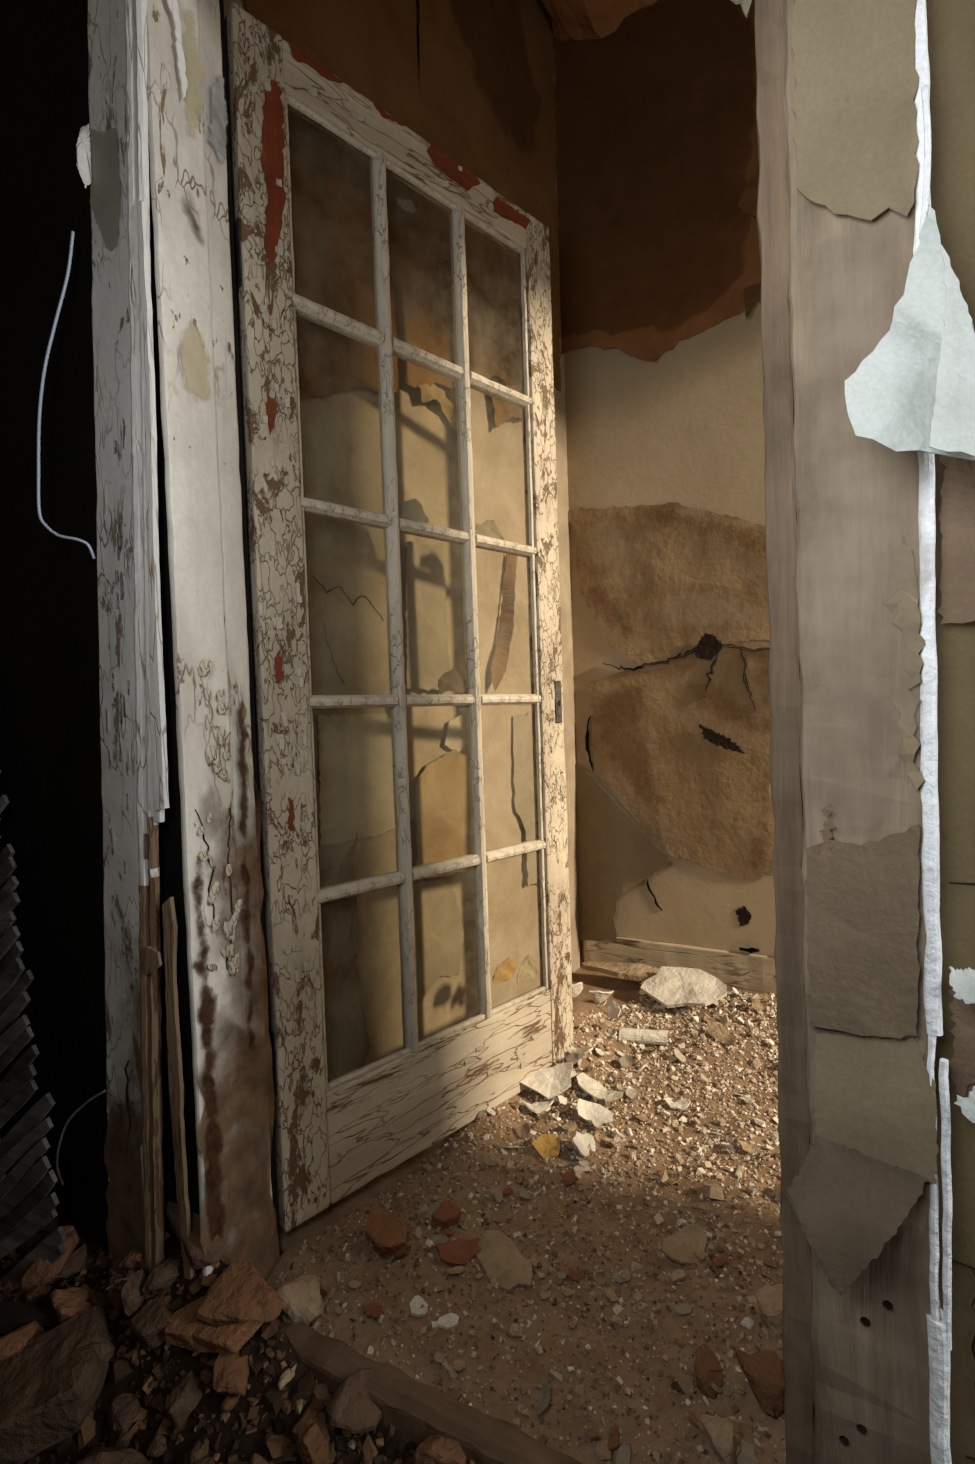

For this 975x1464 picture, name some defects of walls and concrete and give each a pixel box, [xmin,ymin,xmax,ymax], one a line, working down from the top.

peeling [744,281,761,319]
spalling [693,633,723,660]
spalling [699,724,746,754]